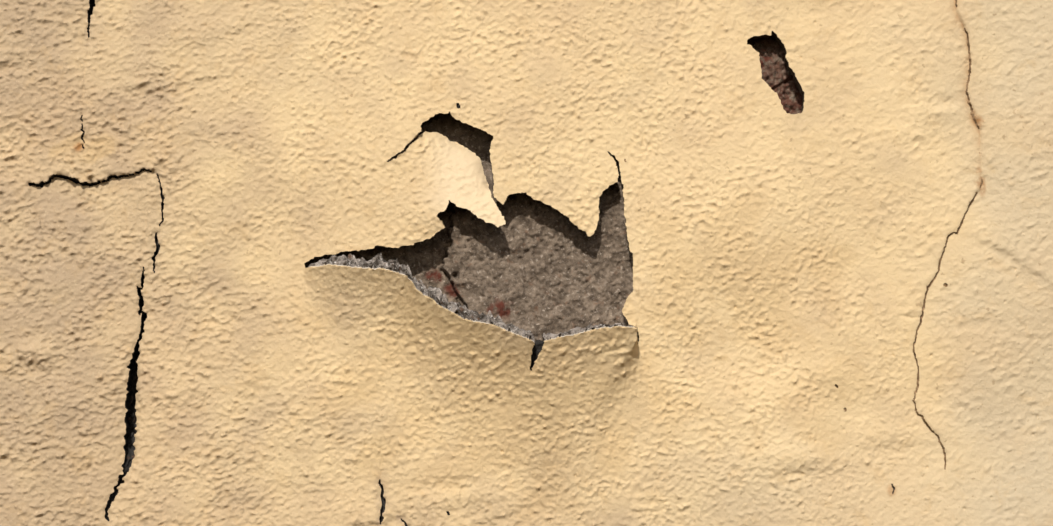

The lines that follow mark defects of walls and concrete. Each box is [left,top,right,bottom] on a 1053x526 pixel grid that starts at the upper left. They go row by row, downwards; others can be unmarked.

crack [23,0,168,523]
spalling [304,101,639,343]
hole [747,31,805,114]
crack [898,0,1053,488]